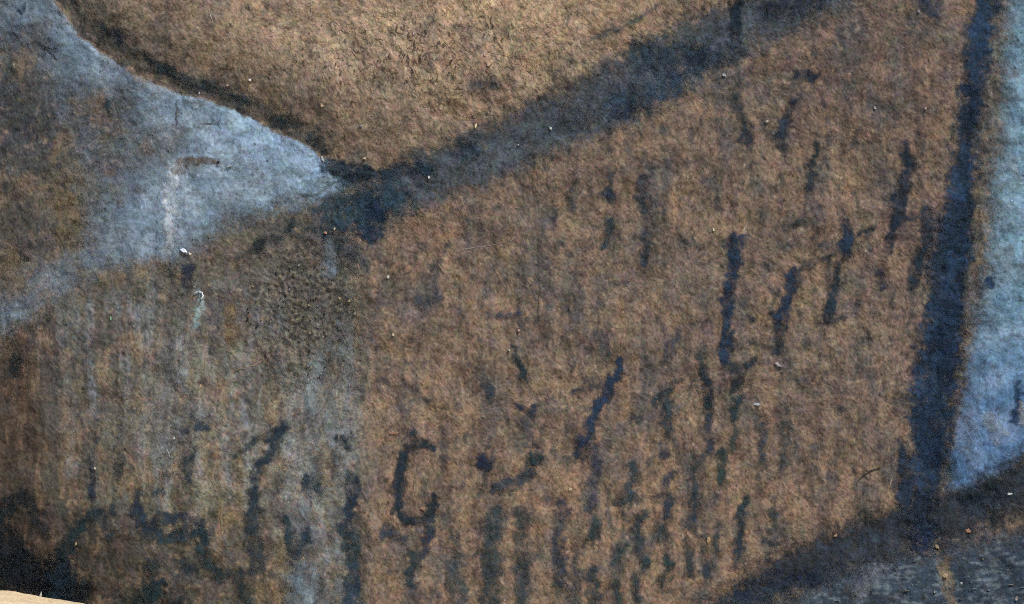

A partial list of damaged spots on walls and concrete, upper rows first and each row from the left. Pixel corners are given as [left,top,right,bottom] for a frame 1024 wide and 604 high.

leakage [312,0,846,278]
efflorescence [161,160,181,255]
leakage [254,223,295,253]
leakage [182,264,206,329]
leakage [708,0,1024,604]
leakage [0,521,96,603]
efflorescence [292,565,345,604]
leakage [478,504,529,604]